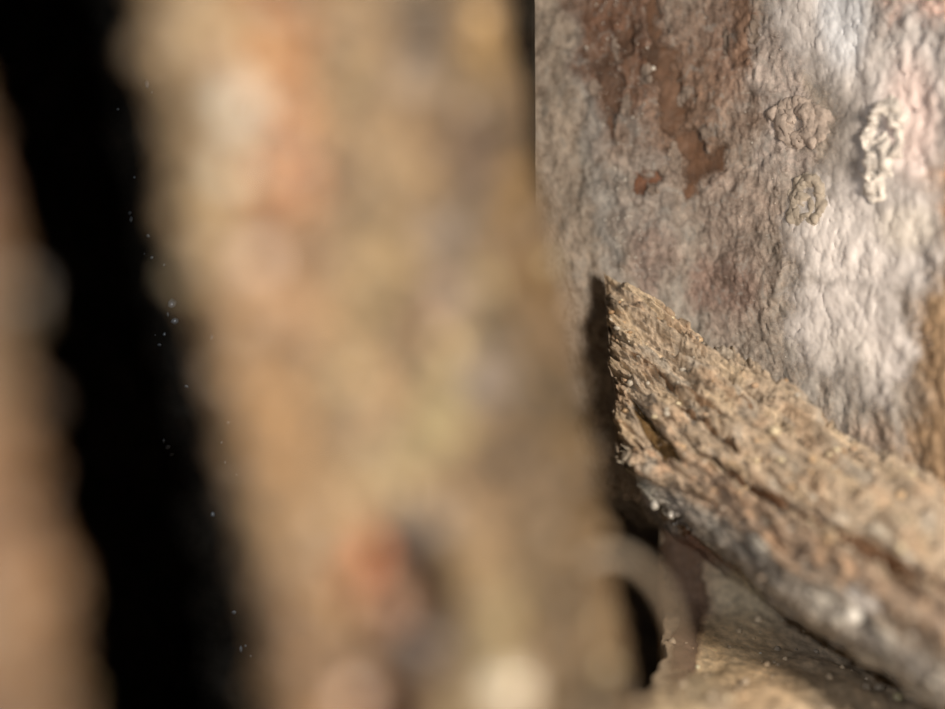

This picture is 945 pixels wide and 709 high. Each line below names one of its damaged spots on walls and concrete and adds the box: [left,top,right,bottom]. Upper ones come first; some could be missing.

leakage [772,0,945,489]